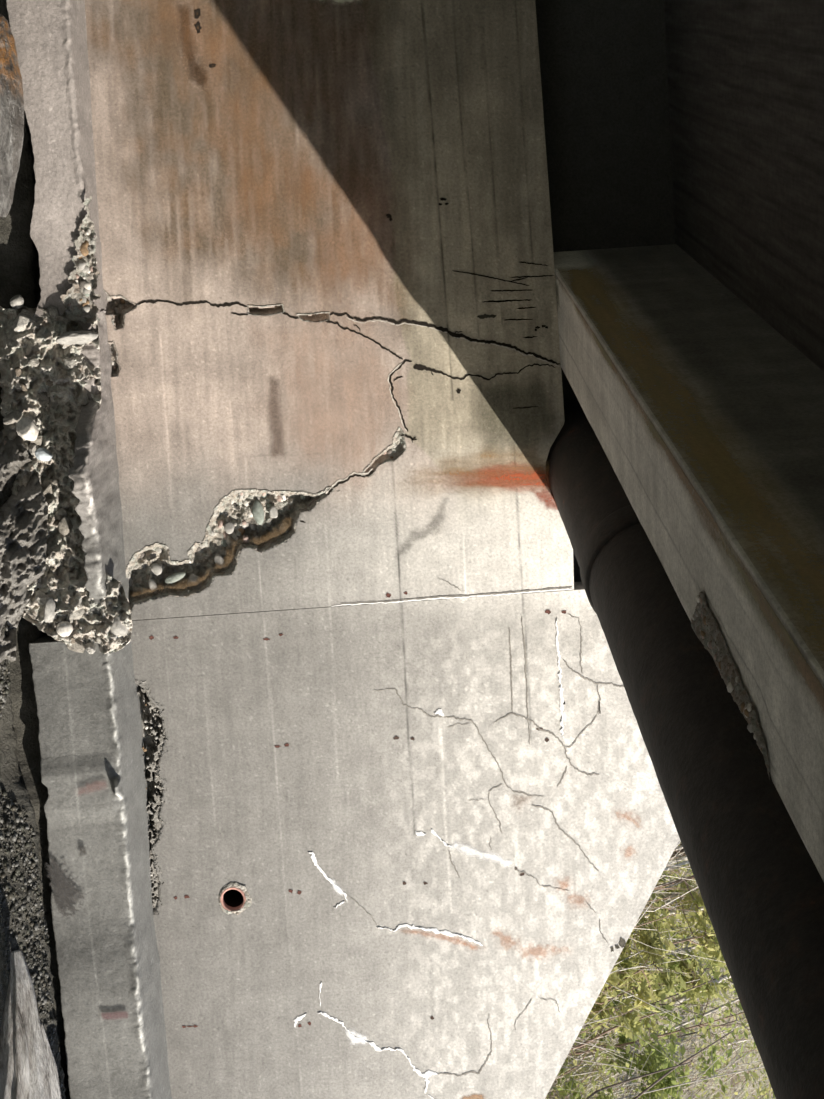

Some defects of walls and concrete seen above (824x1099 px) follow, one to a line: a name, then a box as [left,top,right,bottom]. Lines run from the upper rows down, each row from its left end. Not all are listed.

crack [132,300,254,316]
crack [325,312,561,443]
spalling [0,196,335,654]
spalling [361,427,407,477]
corrosion [434,454,557,509]
crack [331,578,624,871]
spalling [691,591,770,779]
crack [515,868,608,943]
crack [437,997,560,1077]